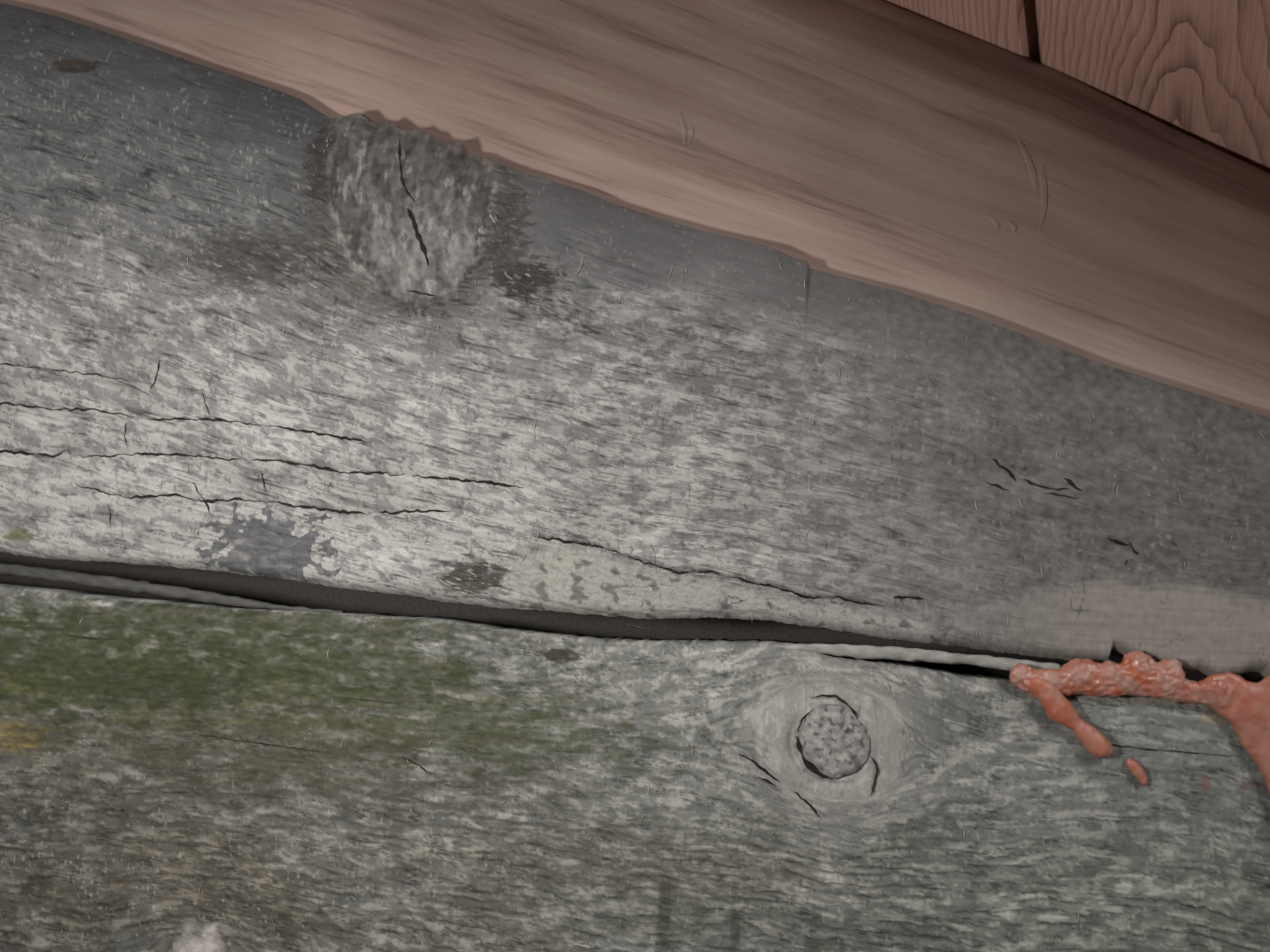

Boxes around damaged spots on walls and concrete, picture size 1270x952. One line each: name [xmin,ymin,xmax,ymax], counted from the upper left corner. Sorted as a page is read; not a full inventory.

leakage [194,502,340,582]
crack [534,536,924,619]